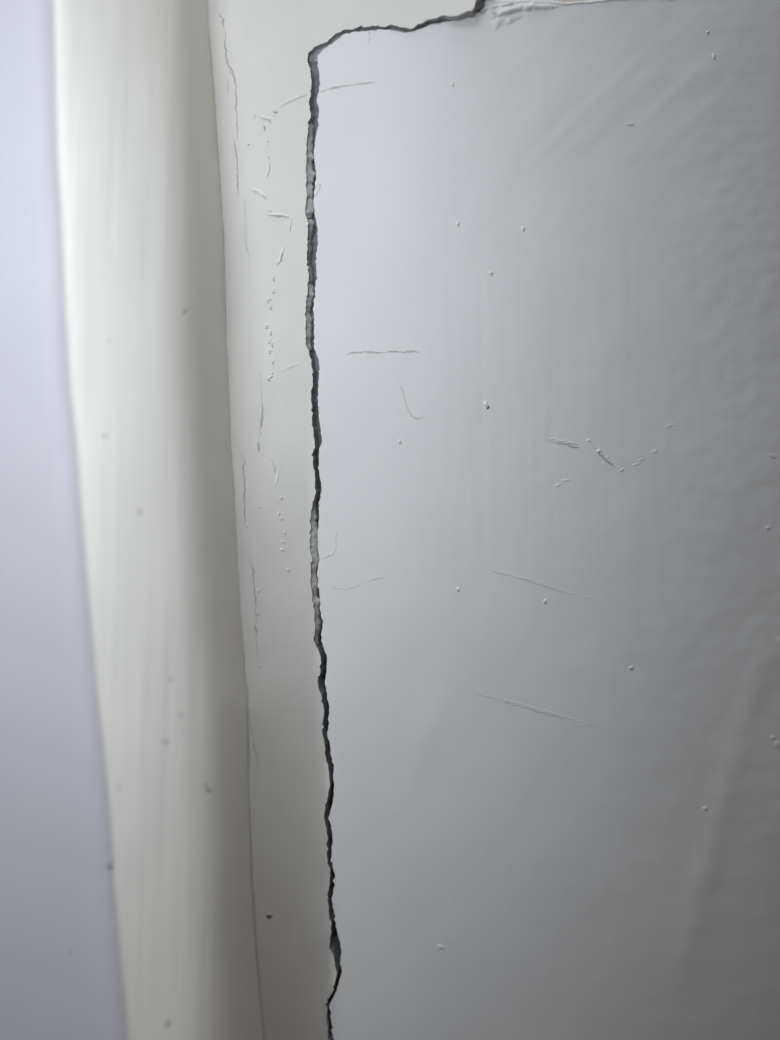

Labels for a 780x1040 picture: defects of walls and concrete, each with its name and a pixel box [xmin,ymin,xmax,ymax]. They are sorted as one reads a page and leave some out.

crack [475,0,485,13]
flaking render [480,2,559,30]
crack [280,21,446,680]
crack [327,782,335,808]
crack [328,967,342,1001]